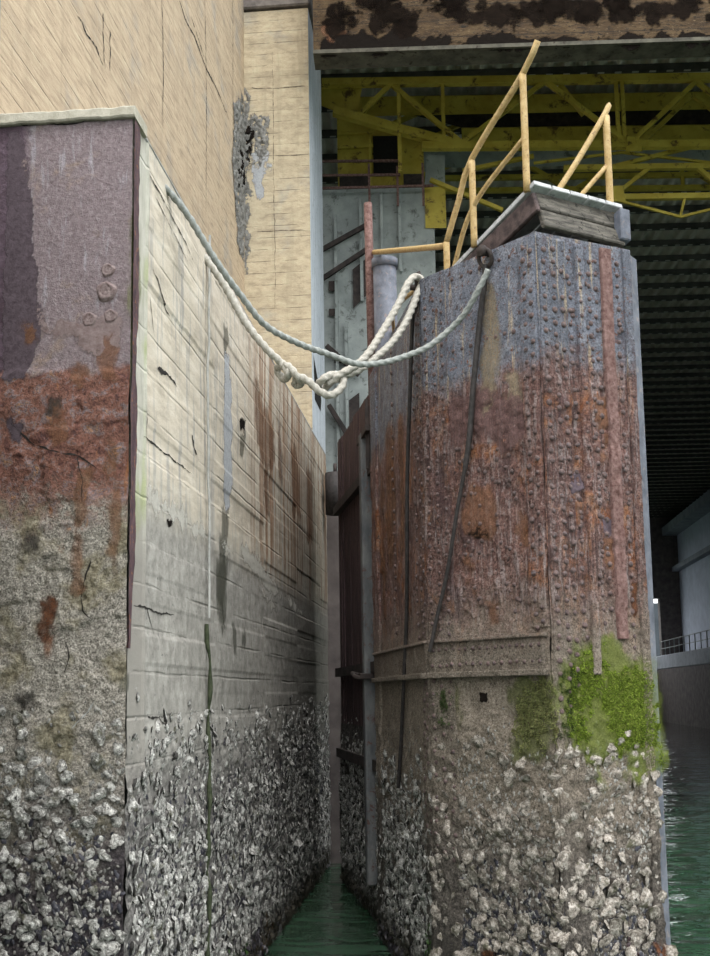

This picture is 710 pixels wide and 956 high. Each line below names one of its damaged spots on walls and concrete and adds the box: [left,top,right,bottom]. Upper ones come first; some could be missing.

peeling [1,131,52,382]
spalling [232,88,270,274]
corrosion [462,485,497,539]
corrosion [37,595,58,654]